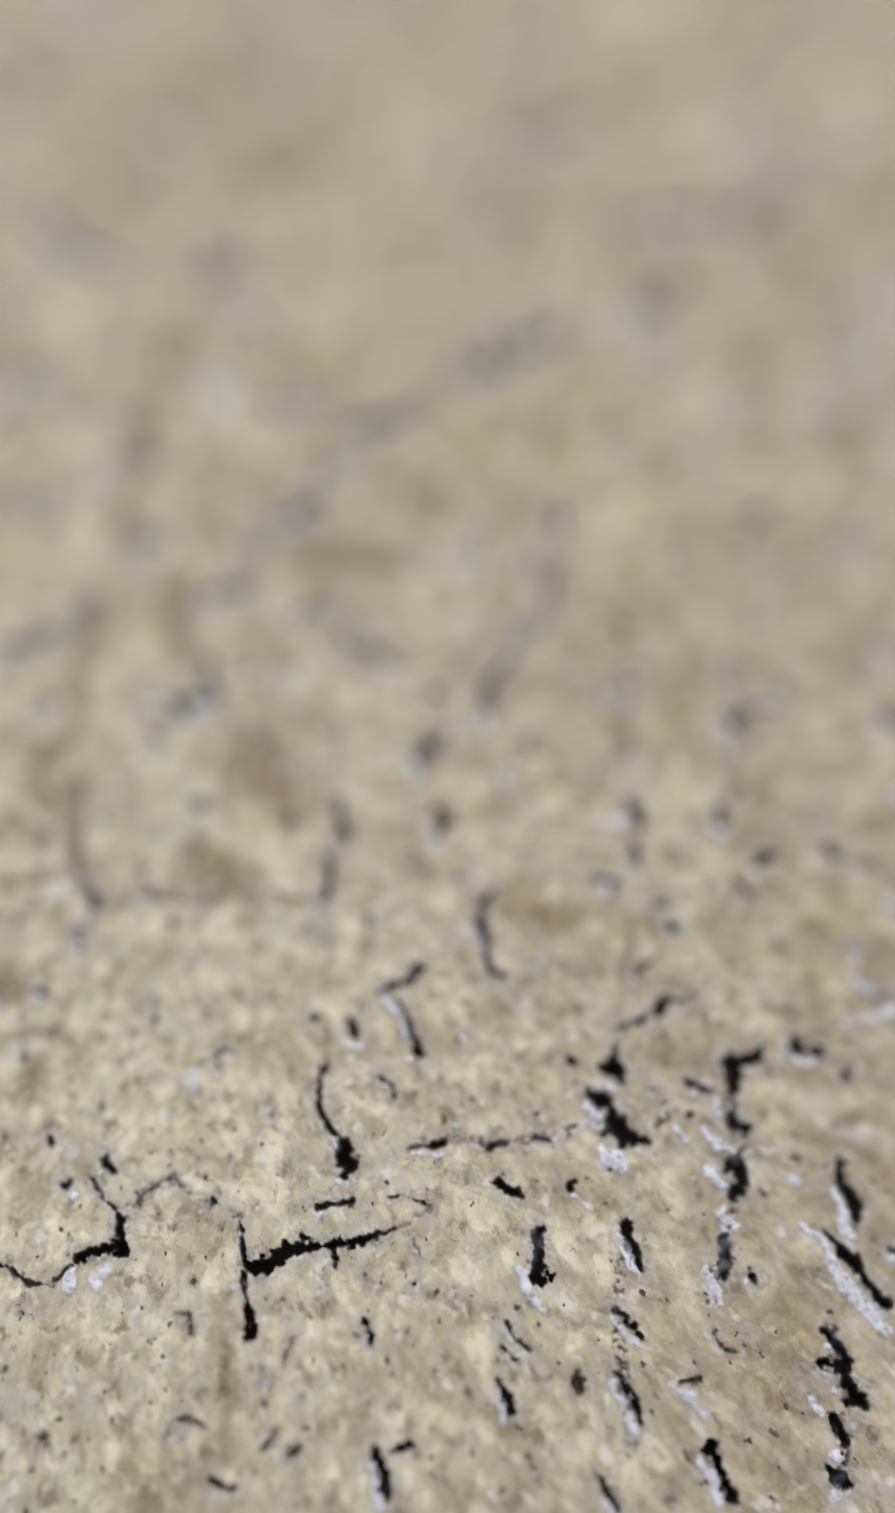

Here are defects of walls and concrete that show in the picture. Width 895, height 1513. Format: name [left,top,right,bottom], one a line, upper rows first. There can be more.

crack [315,801,353,909]
crack [595,799,645,871]
crack [378,962,426,1099]
crack [410,891,764,1353]
crack [0,1177,182,1293]
crack [230,1064,427,1345]
crack [496,1226,556,1425]
crack [607,1218,739,1508]
crack [263,1440,301,1464]
crack [368,1440,415,1511]
crack [595,1474,620,1513]